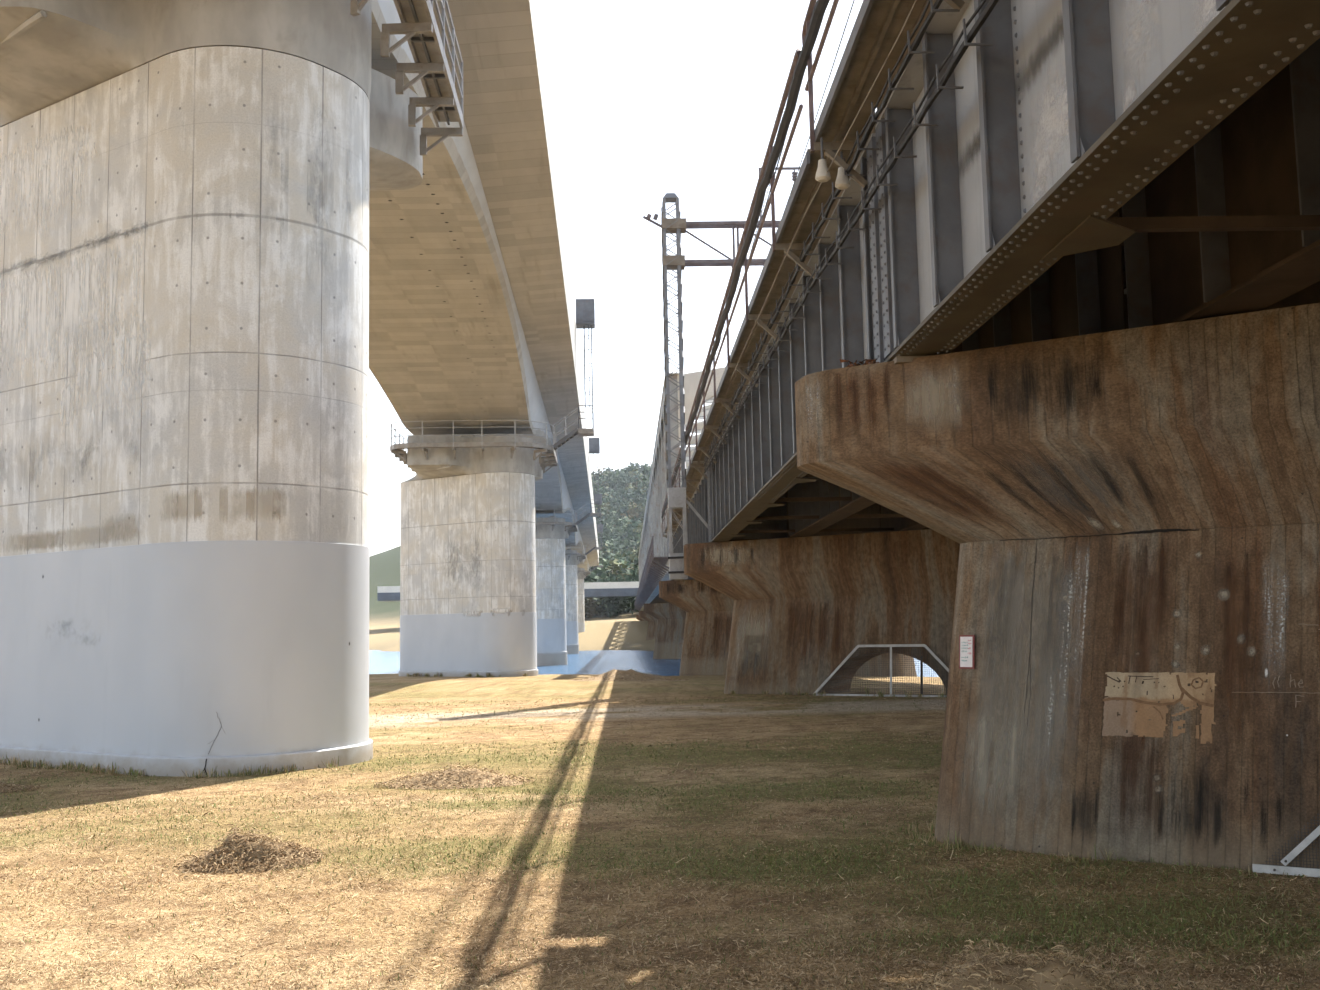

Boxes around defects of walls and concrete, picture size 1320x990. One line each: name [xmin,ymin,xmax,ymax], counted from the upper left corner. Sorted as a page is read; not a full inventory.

damp [1158,784,1221,835]